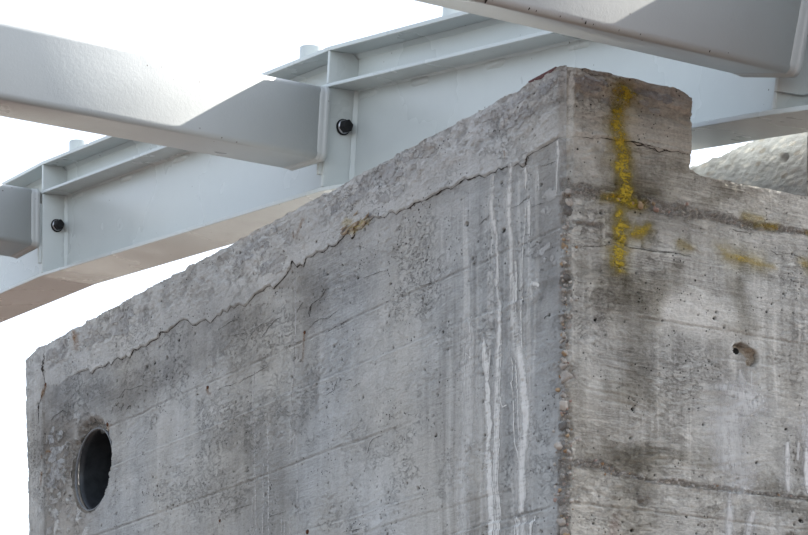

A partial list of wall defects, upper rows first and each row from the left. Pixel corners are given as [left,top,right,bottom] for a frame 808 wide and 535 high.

crack [79,137,683,374]
water stain [458,164,539,535]
spalling [536,184,808,535]
water stain [785,426,808,493]